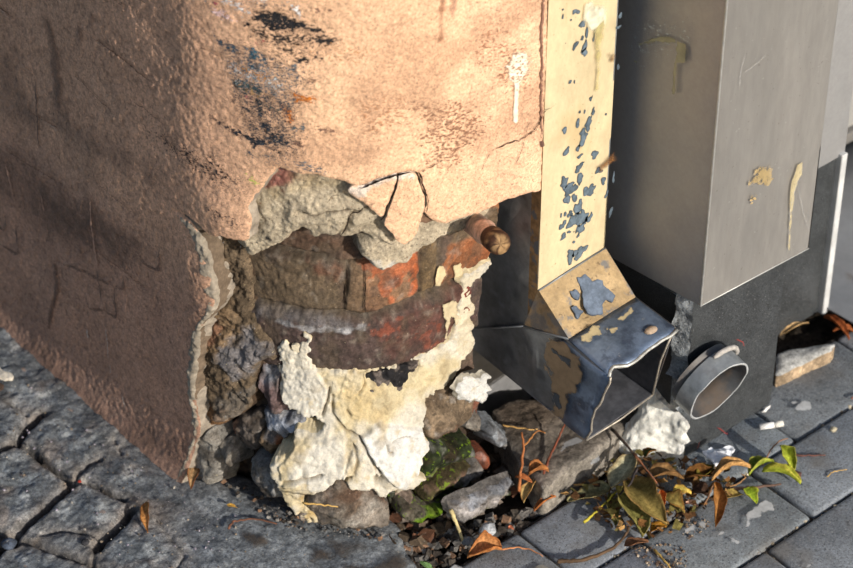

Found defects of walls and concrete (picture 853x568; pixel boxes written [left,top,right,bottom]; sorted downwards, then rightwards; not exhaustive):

peeling [562,8,595,57]
crack [482,108,550,168]
crack [340,160,443,238]
peeling [559,96,615,265]
spalling [175,168,489,481]
peeling [570,274,633,342]
peeling [544,338,582,419]